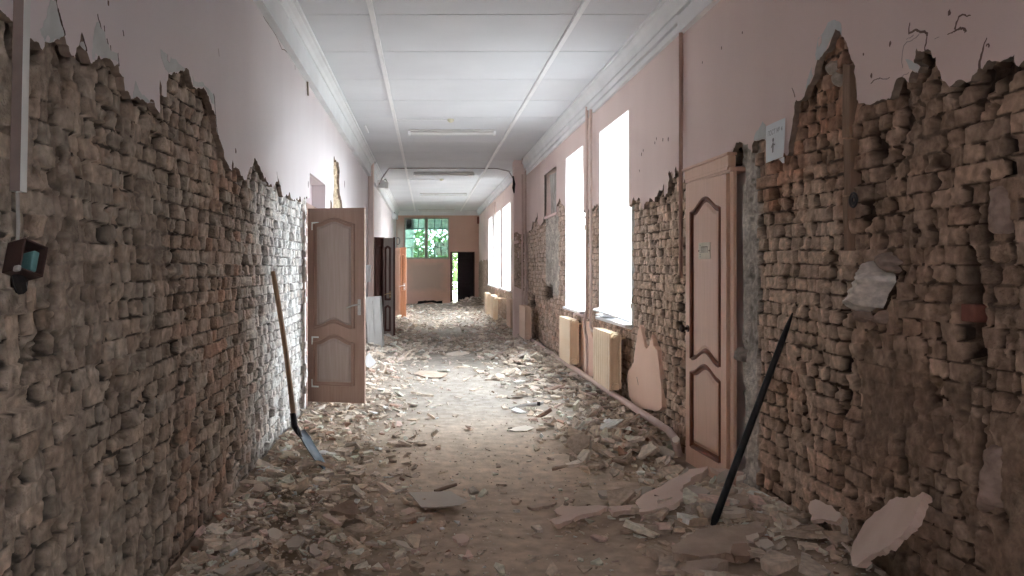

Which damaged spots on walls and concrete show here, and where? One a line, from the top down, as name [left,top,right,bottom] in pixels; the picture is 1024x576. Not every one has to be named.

spalling [0,0,309,576]
spalling [478,171,687,454]
spalling [736,20,1024,576]
crack [871,14,990,84]